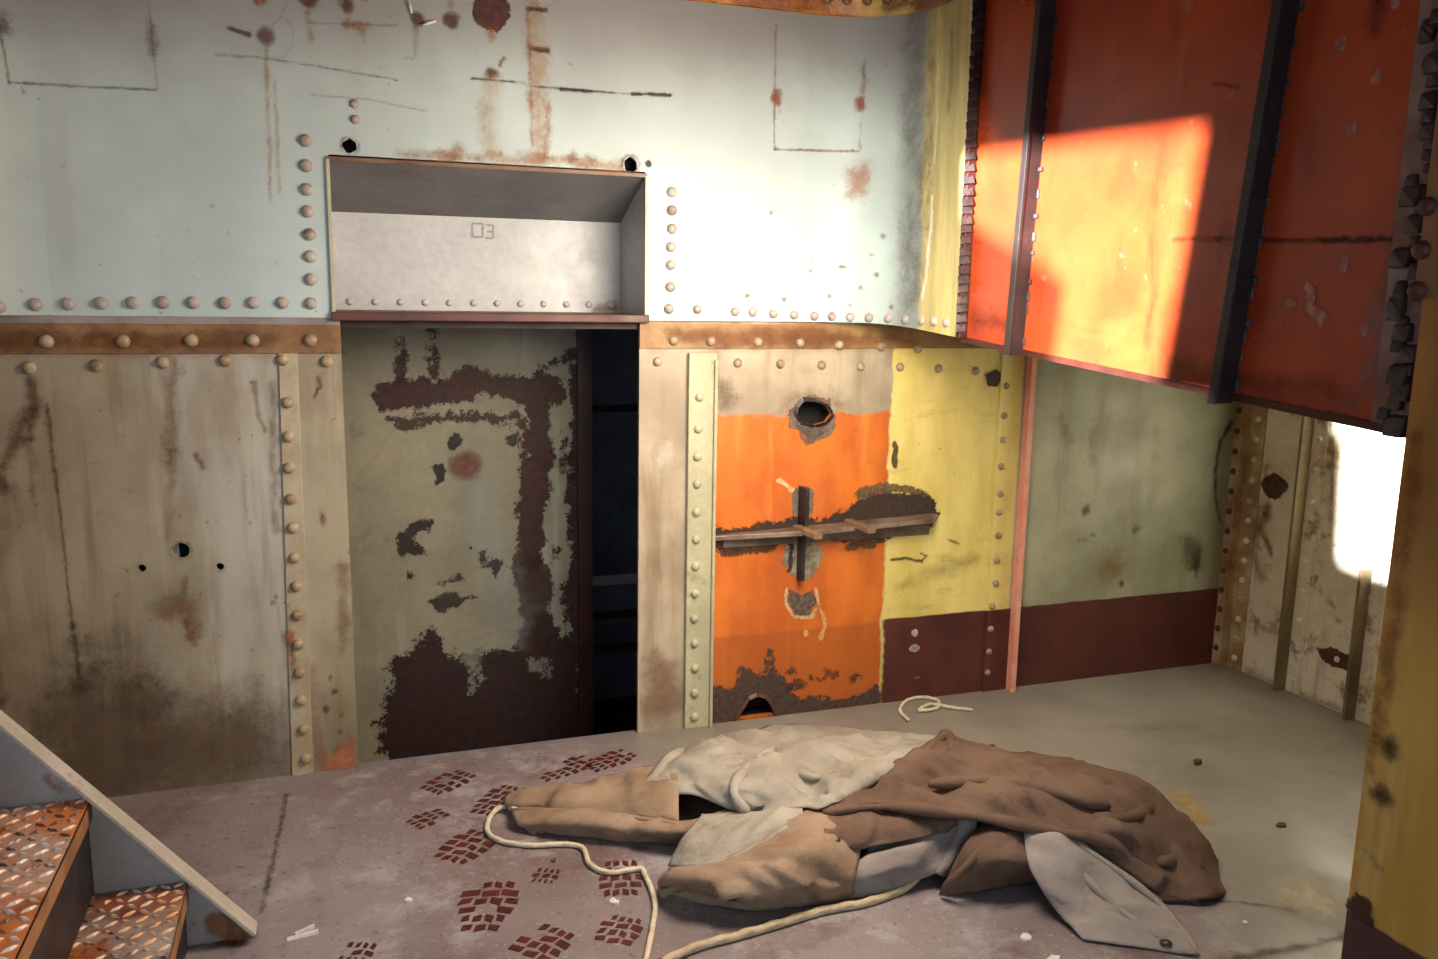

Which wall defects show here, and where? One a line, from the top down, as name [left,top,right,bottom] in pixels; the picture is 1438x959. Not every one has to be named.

rust [408,0,512,32]
peeling [776,478,814,515]
peeling [370,328,579,760]
peeling [712,649,881,723]
peeling [1318,646,1349,671]
leakage [46,678,269,796]